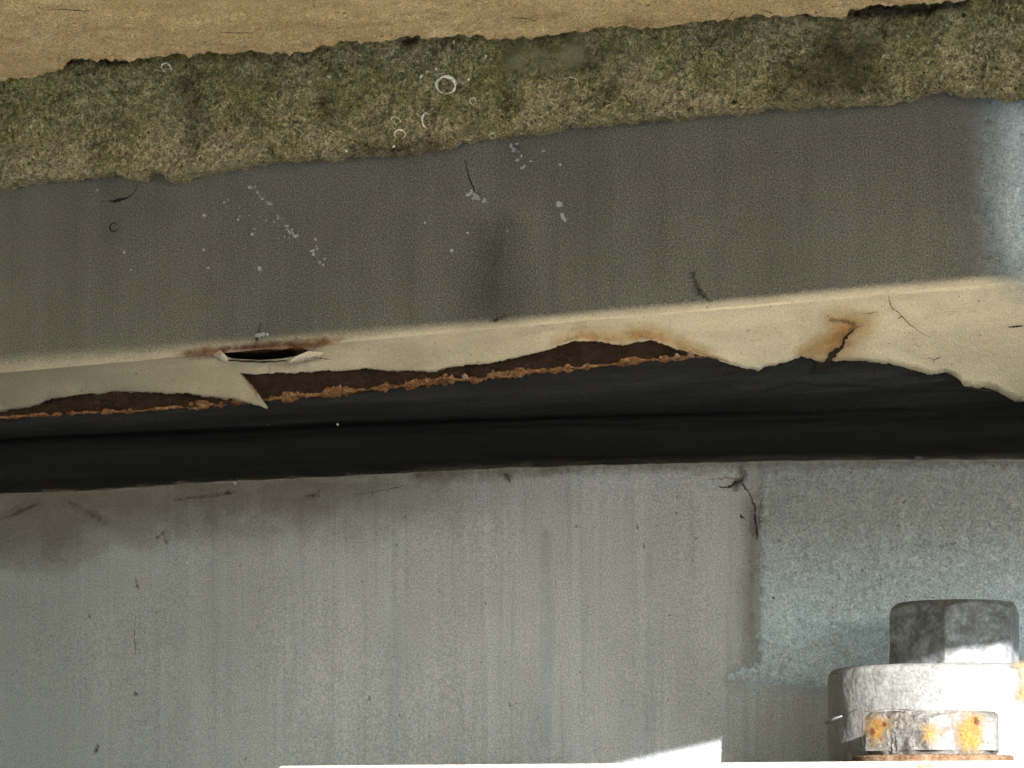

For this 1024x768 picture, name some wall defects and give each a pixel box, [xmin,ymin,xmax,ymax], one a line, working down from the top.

crack [888,296,927,336]
corrosion [565,330,703,353]
crack [808,319,863,371]
peeling [242,340,708,403]
peeling [722,356,997,393]
peeling [0,391,246,419]
crack [708,467,760,540]